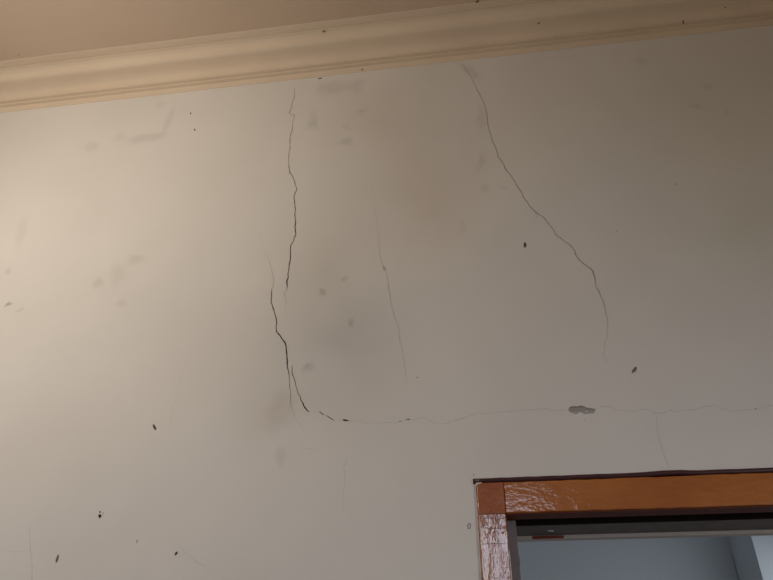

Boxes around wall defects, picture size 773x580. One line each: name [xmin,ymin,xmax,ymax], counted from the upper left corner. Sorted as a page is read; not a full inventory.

crack [271,98,333,420]
crack [478,92,605,306]
spalling [568,405,596,414]